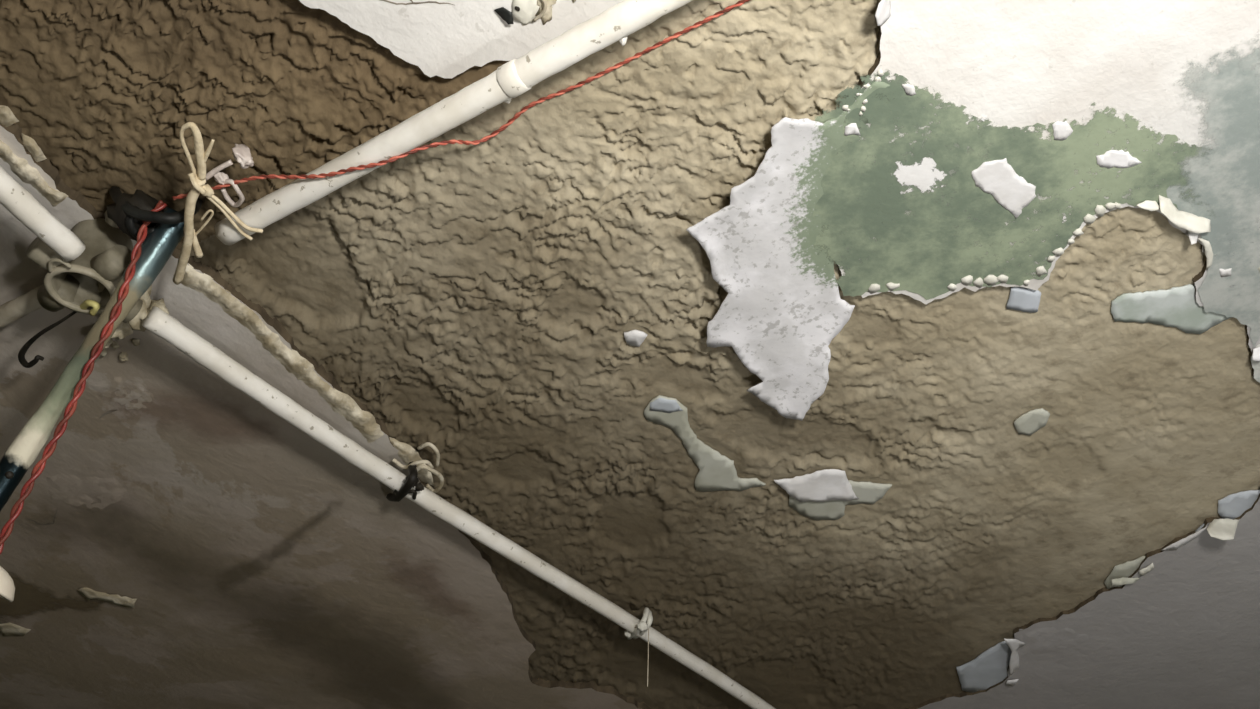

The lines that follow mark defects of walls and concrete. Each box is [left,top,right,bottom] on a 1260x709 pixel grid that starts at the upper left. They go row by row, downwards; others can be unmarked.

flaking render [0,0,509,213]
flaking render [193,194,226,242]
leakage [813,48,1260,347]
peeling [1137,195,1211,245]
peeling [686,81,890,421]
peeling [1199,238,1213,270]
peeling [774,469,859,503]
peeling [1162,523,1208,550]
peeling [1207,489,1260,540]
leakage [0,576,102,618]
flaking render [476,540,752,709]
peeling [956,638,1026,693]